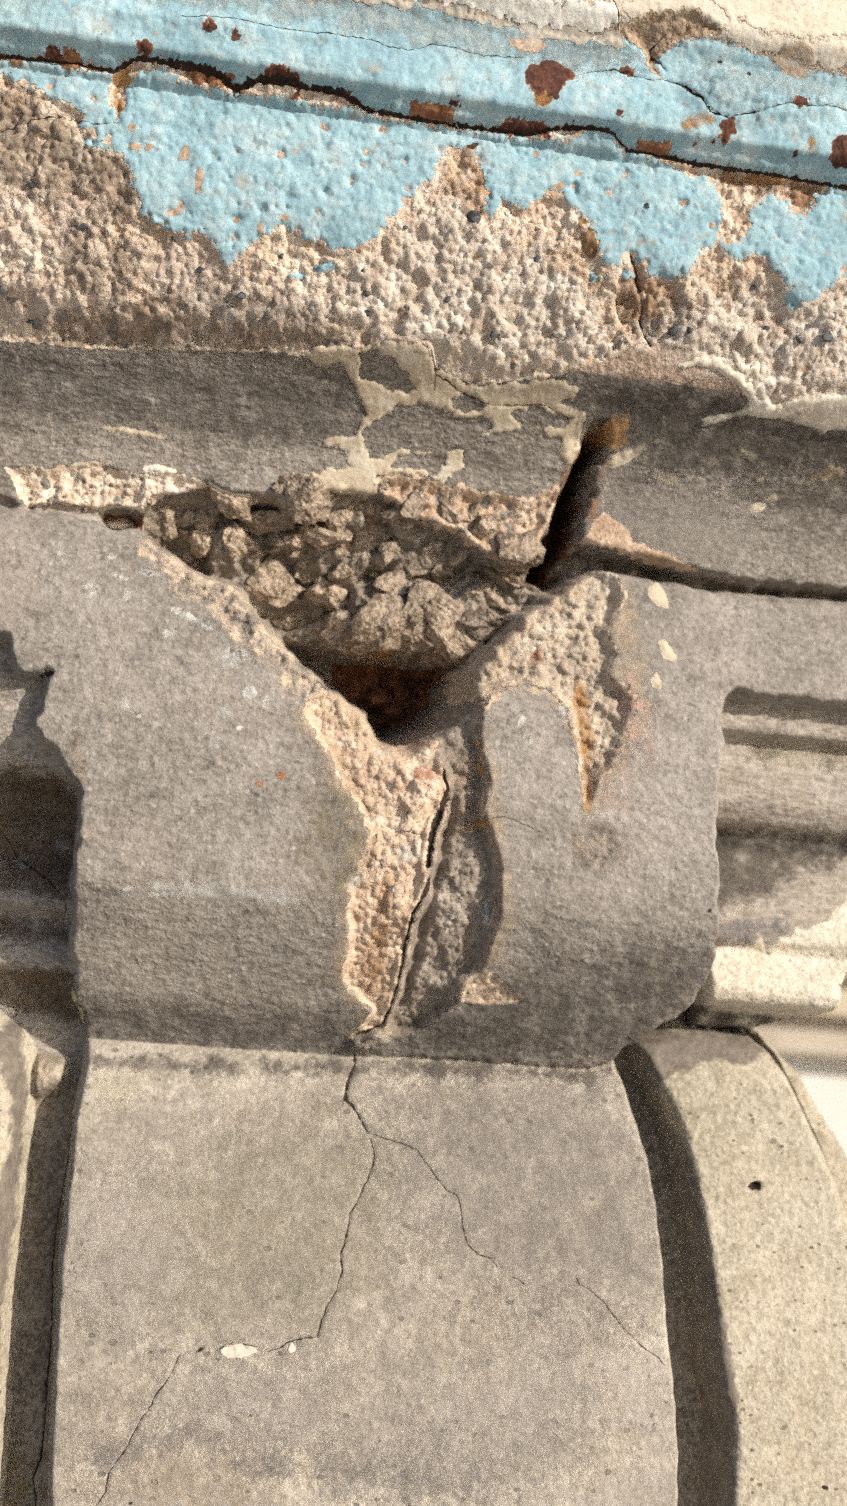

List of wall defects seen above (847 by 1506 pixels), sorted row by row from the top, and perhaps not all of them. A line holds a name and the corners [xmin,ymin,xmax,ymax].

corrosion [202,17,241,41]
corrosion [45,38,153,118]
corrosion [264,63,300,101]
corrosion [467,60,575,149]
corrosion [620,66,636,77]
corrosion [681,115,737,146]
corrosion [793,95,810,108]
corrosion [720,171,821,209]
crack [431,348,594,589]
peeling [0,0,847,1041]
crack [98,769,526,1504]
crack [575,1276,665,1365]